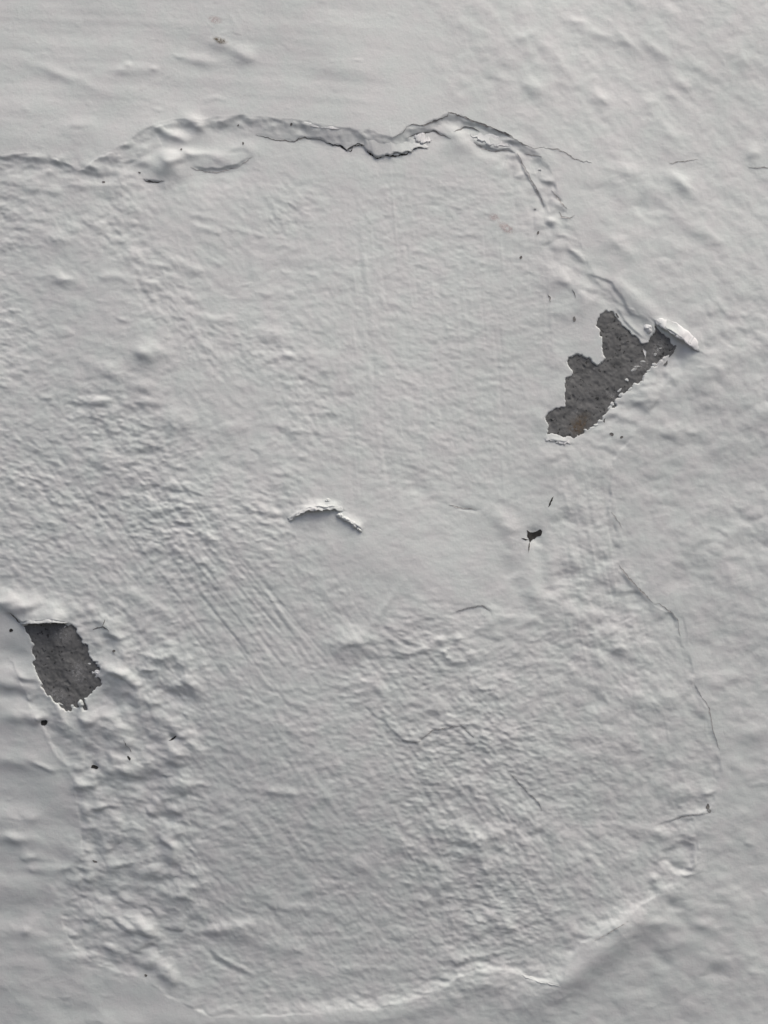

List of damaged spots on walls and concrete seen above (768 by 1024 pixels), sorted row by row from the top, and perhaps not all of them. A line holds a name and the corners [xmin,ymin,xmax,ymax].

crack [320,112,592,163]
peeling [545,310,699,445]
peeling [285,498,362,537]
peeling [522,529,542,551]
peeling [9,613,102,711]